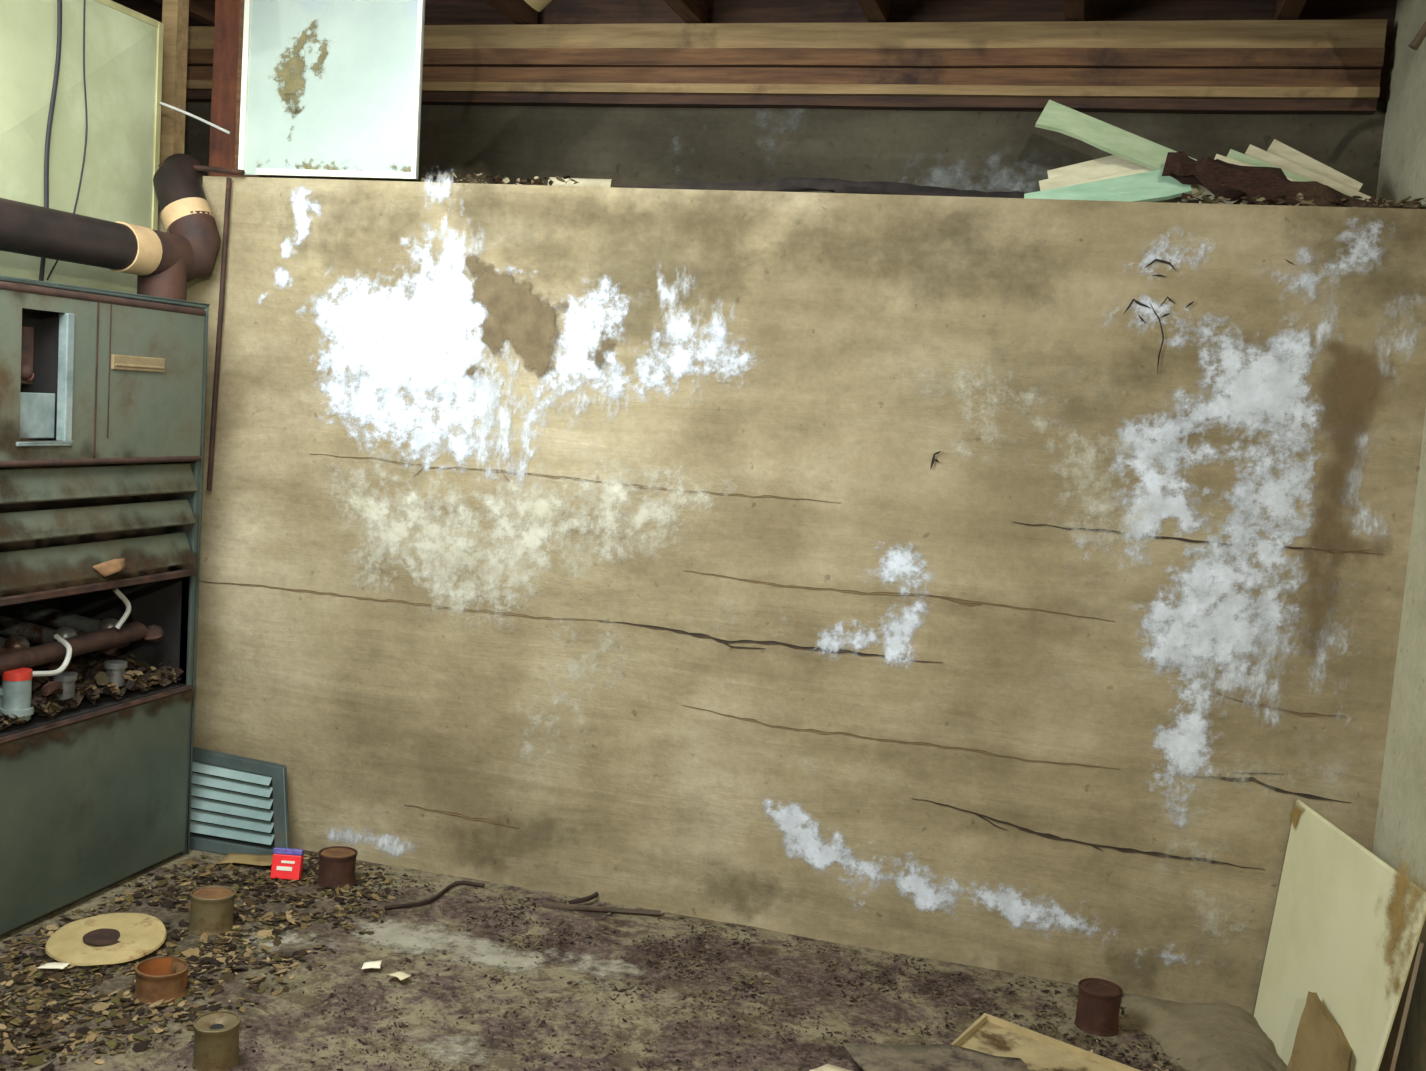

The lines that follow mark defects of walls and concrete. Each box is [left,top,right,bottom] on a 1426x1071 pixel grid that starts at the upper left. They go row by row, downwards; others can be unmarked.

water stain [425,178,451,202]
water stain [1140,238,1212,277]
water stain [1285,219,1380,292]
water stain [303,218,751,610]
water stain [1064,296,1417,826]
crack [199,580,943,663]
crack [1192,772,1351,803]
water stain [765,800,1095,934]
crack [912,798,1261,869]